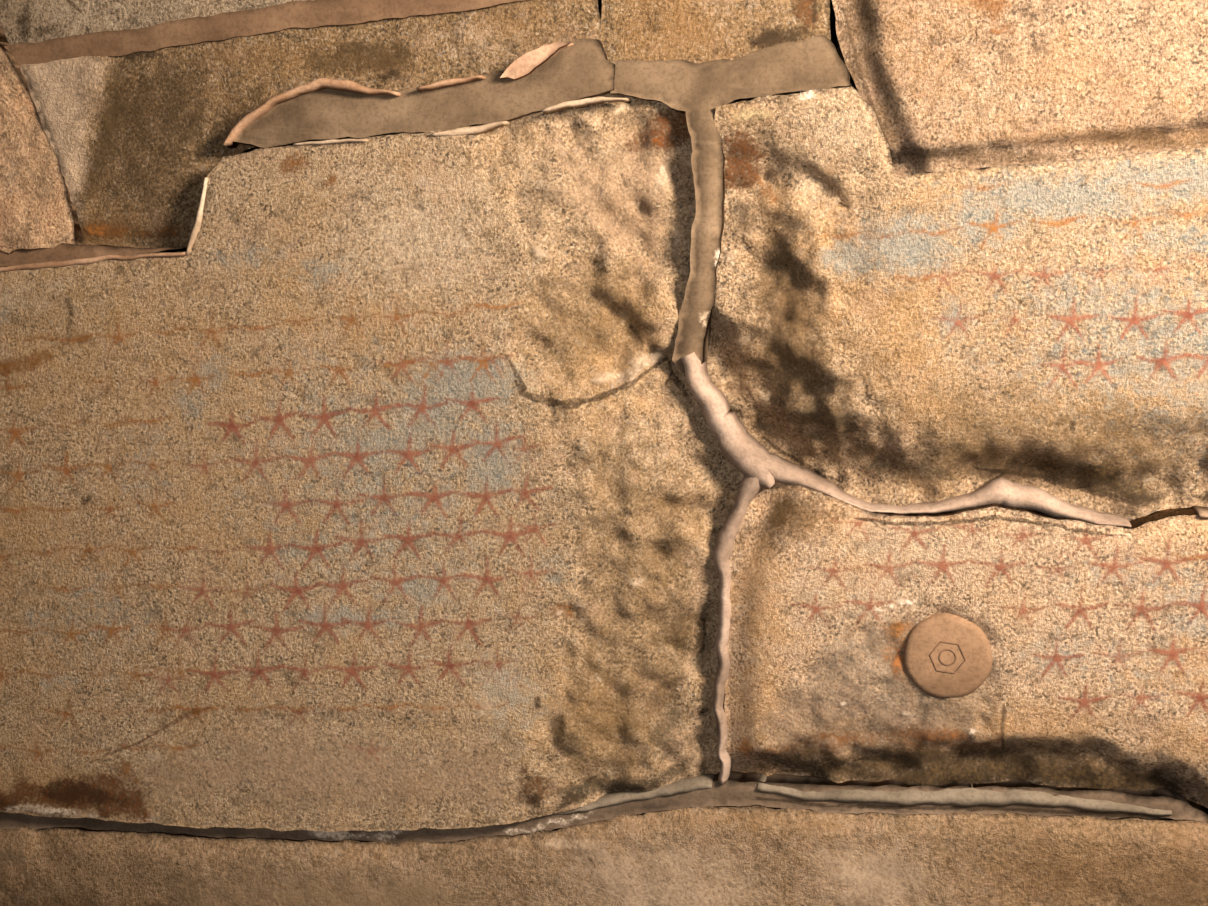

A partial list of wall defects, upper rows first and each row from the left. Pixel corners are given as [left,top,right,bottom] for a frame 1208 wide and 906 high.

crack [506,326,691,421]
water stain [1005,456,1162,506]
corrosion [0,763,149,821]
water stain [560,767,685,807]
water stain [901,759,1197,803]